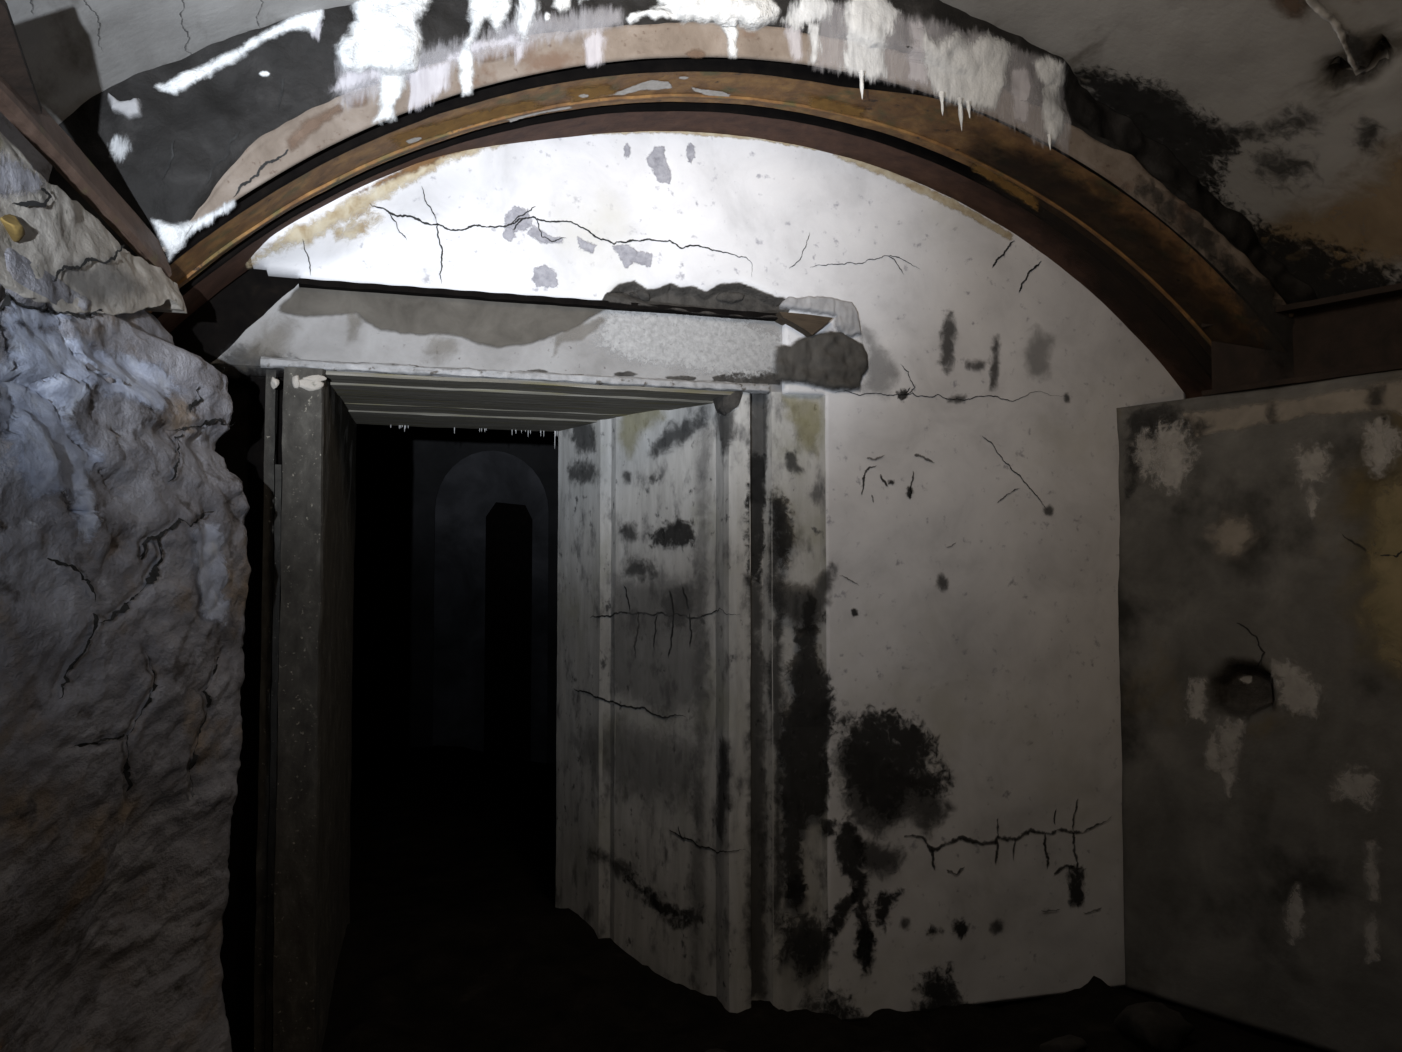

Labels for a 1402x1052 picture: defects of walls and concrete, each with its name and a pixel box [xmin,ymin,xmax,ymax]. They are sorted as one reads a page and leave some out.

damp [156,10,323,94]
damp [288,0,571,150]
damp [627,0,1065,150]
crack [12,188,52,208]
crack [0,245,125,329]
spalling [532,265,558,287]
spalling [503,206,596,253]
crack [370,188,752,283]
spalling [647,146,671,184]
spalling [602,245,790,317]
damp [280,287,782,377]
crack [904,799,1111,914]